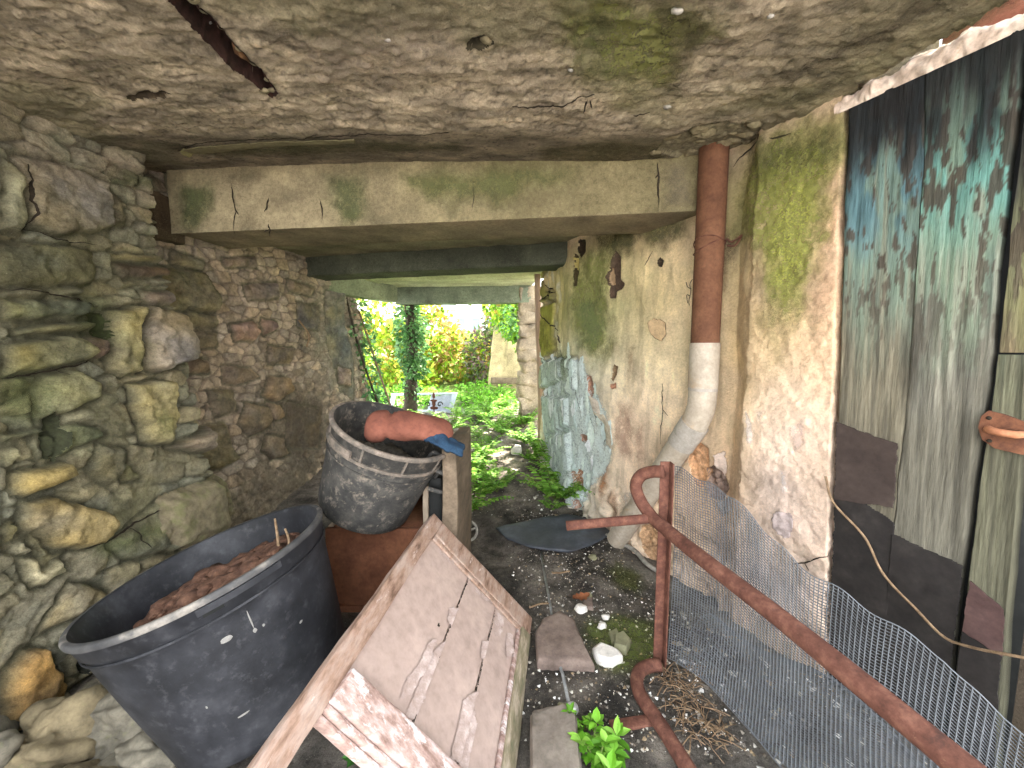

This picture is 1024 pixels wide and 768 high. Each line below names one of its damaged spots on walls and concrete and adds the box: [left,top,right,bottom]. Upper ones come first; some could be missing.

crack [512,94,595,113]
crack [23,164,95,245]
crack [231,183,239,234]
crack [653,163,661,207]
water stain [769,183,813,287]
spalling [605,251,625,298]
peeling [540,342,613,509]
spalling [688,442,730,516]